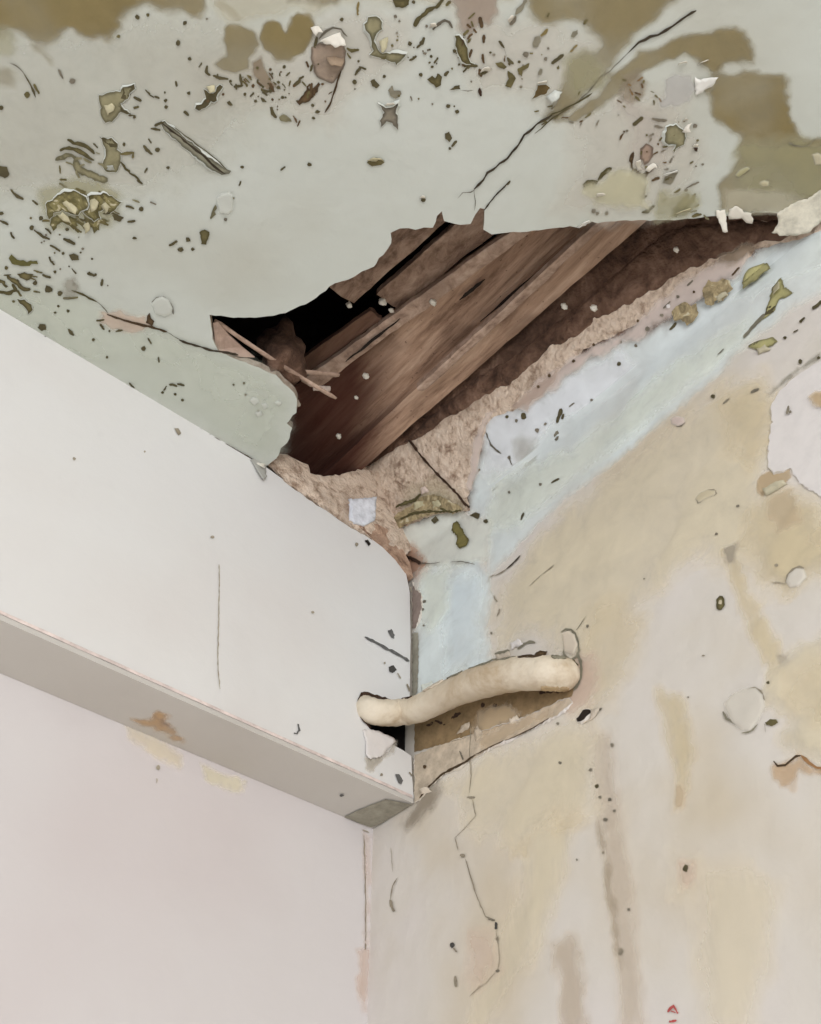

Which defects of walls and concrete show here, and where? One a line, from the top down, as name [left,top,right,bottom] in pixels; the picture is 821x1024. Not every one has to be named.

peeling [617,77,662,116]
spalling [250,116,821,555]